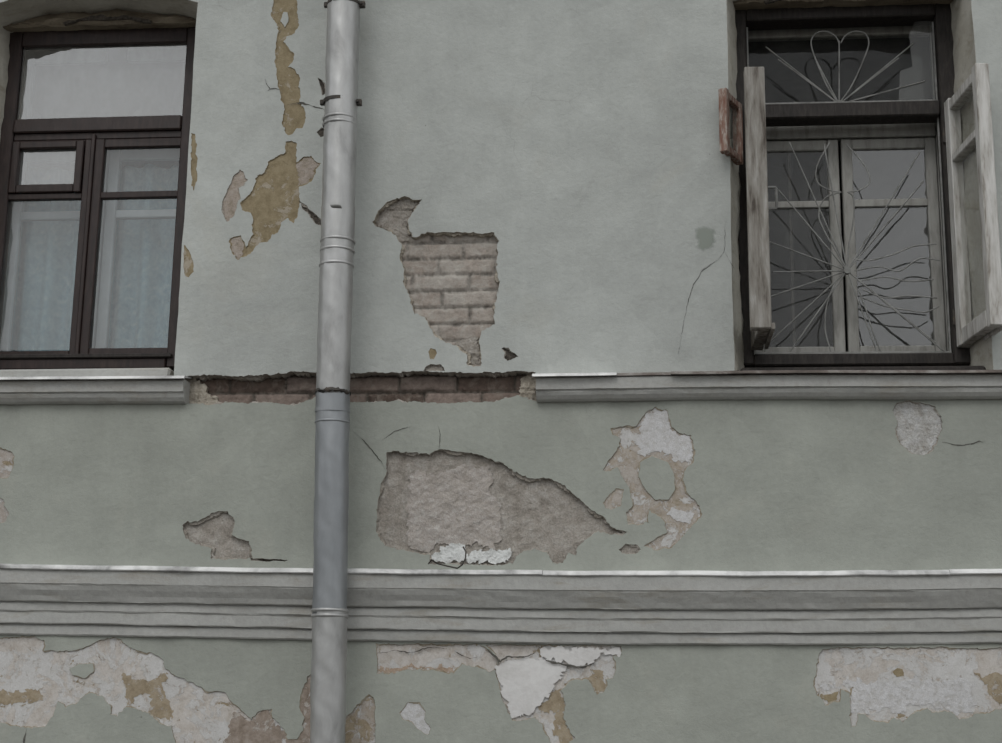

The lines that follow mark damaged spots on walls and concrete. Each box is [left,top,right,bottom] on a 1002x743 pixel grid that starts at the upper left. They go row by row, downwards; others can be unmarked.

peeling [221,0,321,260]
spalling [350,196,537,402]
spalling [186,371,317,382]
spalling [893,400,942,455]
spalling [376,407,702,566]
spalling [182,511,287,562]
peeling [376,643,498,674]
peeling [0,636,311,743]
peeling [813,646,1002,727]
peeling [345,694,376,743]
peeling [399,702,431,735]